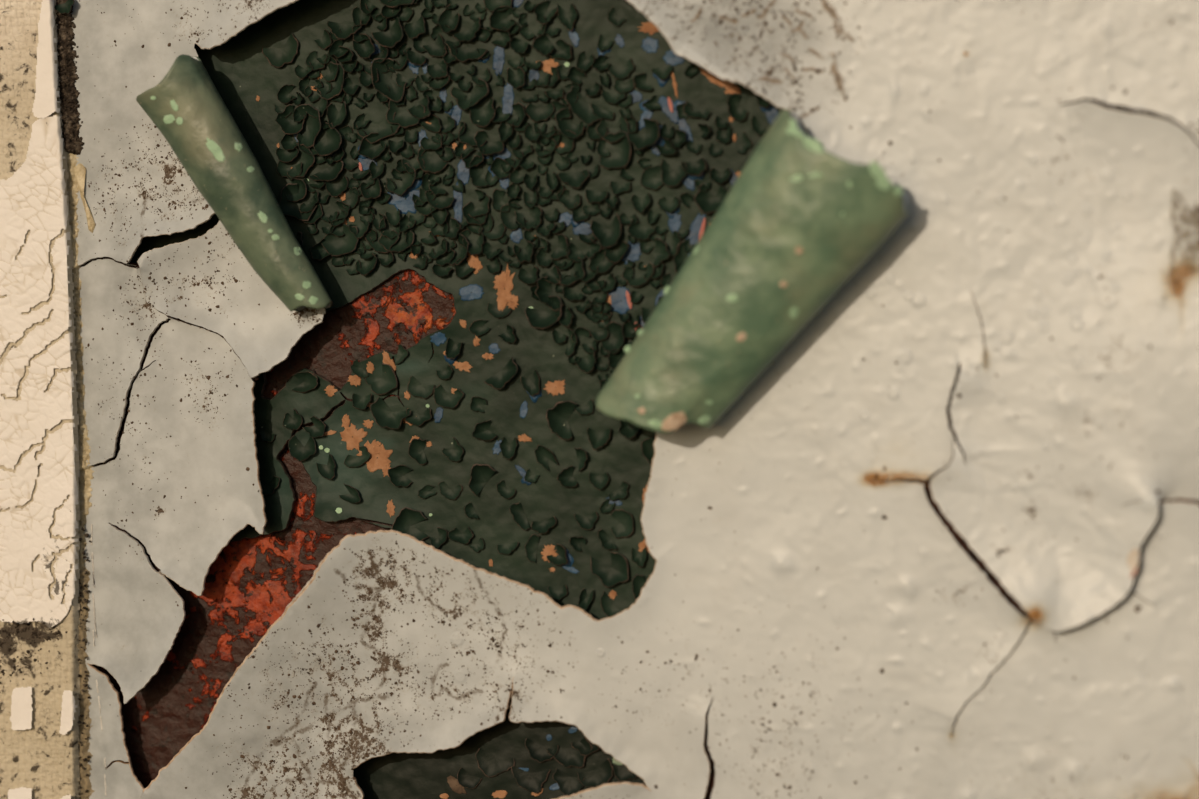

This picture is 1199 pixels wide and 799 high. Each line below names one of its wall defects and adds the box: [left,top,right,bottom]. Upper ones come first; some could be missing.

crack [0,0,259,628]
rust [92,270,456,788]
peeling [78,0,909,799]
crack [703,697,715,799]
rust [864,473,917,486]
crack [869,290,1199,736]
crack [1060,98,1199,145]